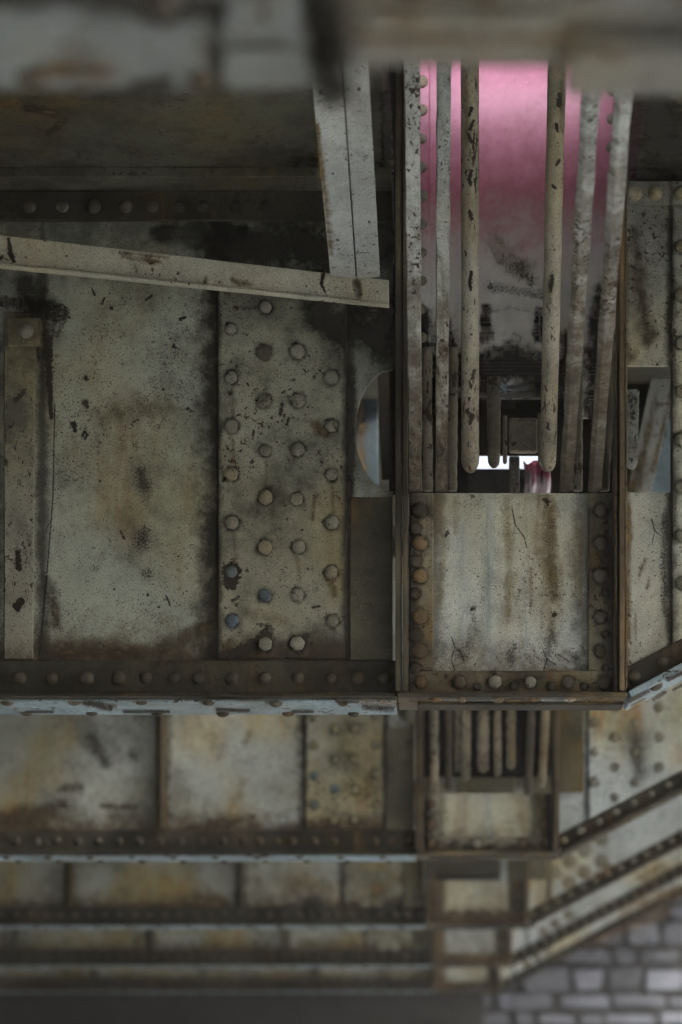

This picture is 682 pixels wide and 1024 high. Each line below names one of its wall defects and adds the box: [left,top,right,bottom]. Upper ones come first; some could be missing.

corrosion [530,495,559,619]
peeling [0,695,397,714]
peeling [627,671,682,707]
corrosion [0,784,85,830]